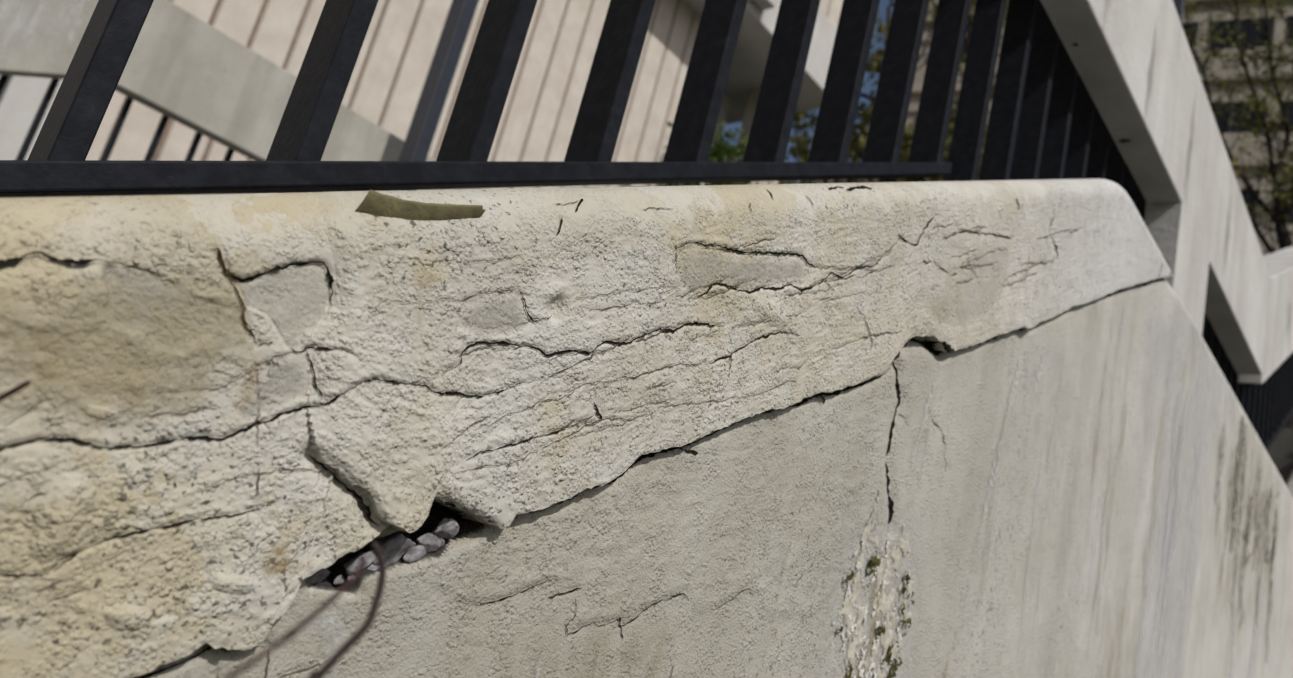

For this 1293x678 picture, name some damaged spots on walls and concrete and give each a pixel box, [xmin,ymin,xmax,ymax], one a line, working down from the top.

crack [807,186,873,206]
crack [0,190,1164,617]
water stain [1216,416,1278,678]